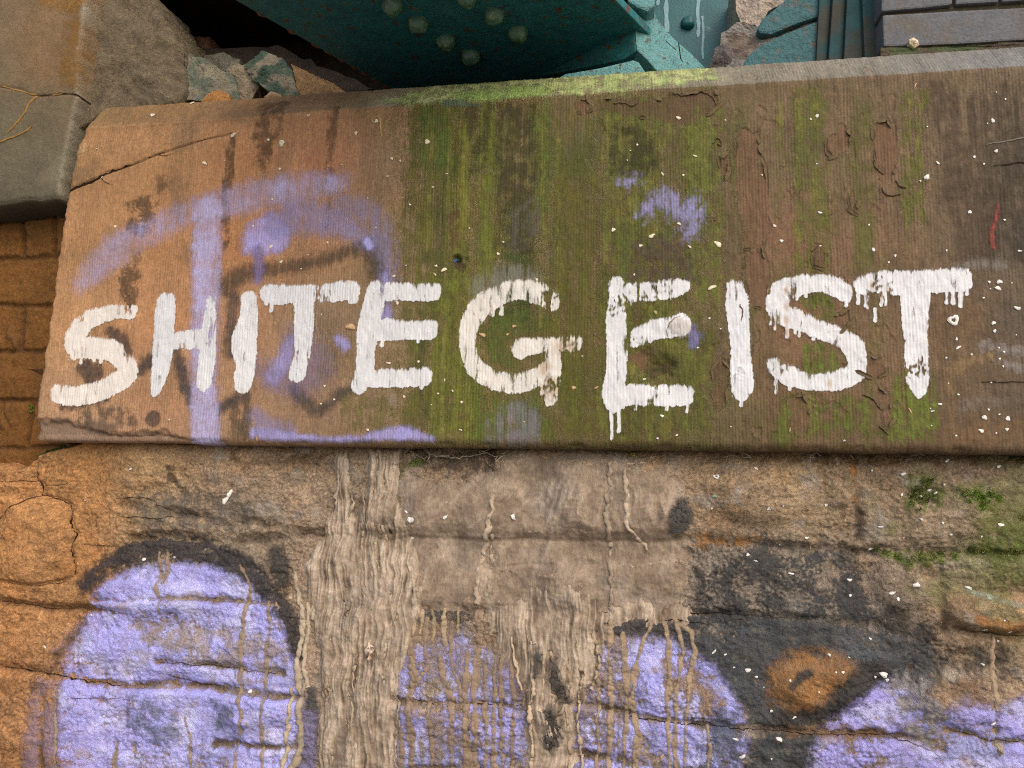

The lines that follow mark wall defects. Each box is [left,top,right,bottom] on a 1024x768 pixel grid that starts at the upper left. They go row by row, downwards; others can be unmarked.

crack [69,133,231,193]
damp [628,235,698,288]
damp [415,448,499,478]
crack [0,473,114,611]
damp [394,600,517,768]
damp [594,613,698,768]